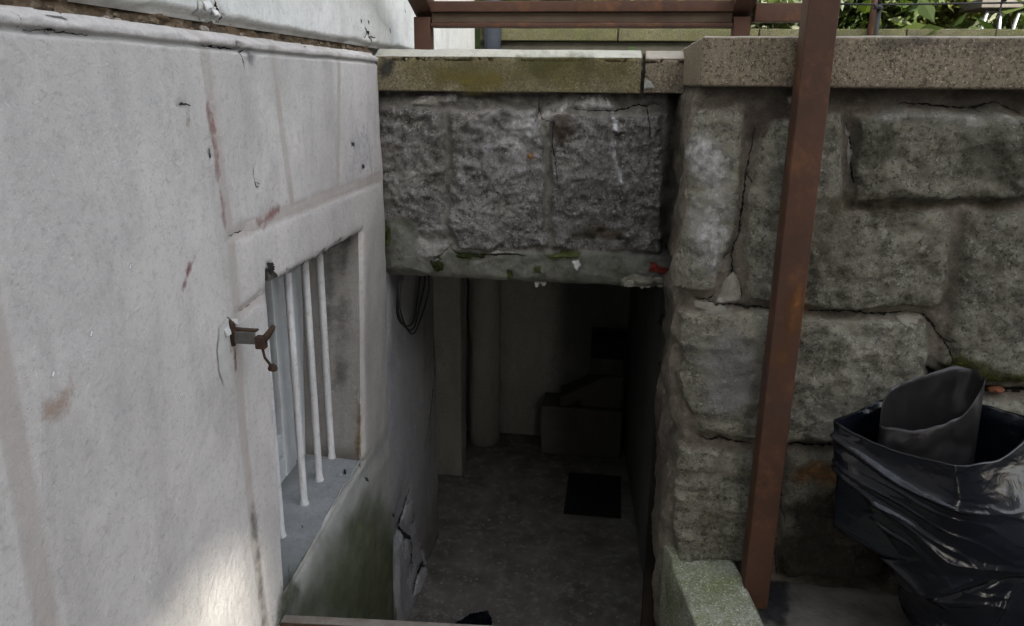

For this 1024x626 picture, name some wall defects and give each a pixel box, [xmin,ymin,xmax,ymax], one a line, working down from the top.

spalling [0,0,372,53]
crack [534,54,659,179]
crack [899,101,1020,114]
damp [416,226,449,259]
crack [693,130,769,309]
peeling [392,495,428,614]